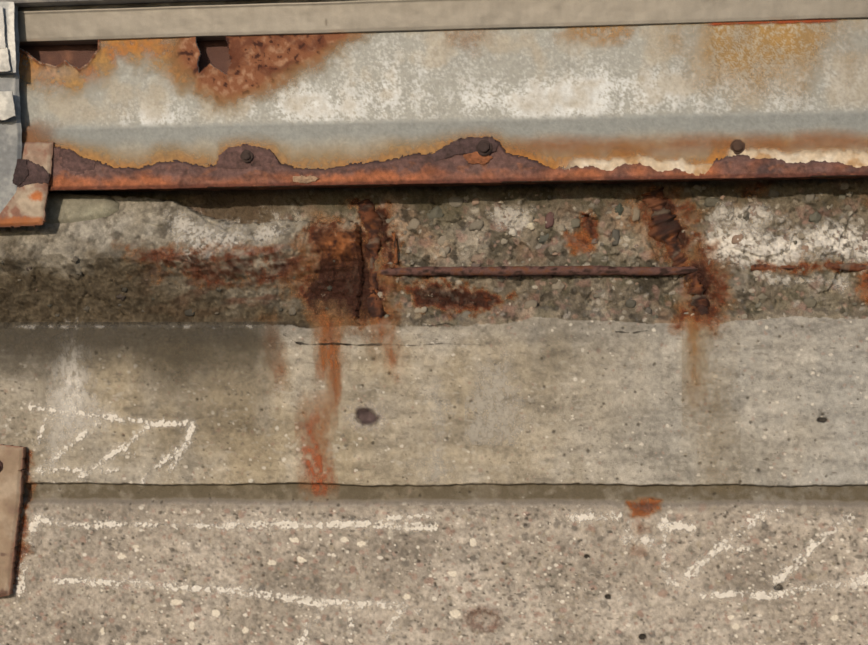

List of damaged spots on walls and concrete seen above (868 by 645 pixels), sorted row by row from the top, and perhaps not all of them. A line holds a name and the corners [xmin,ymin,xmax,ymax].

rust [19,33,363,107]
rust [22,128,868,352]
spalling [76,149,868,327]
water stain [701,206,868,267]
rust [135,201,517,402]
rust [302,409,329,493]
rust [626,498,661,517]